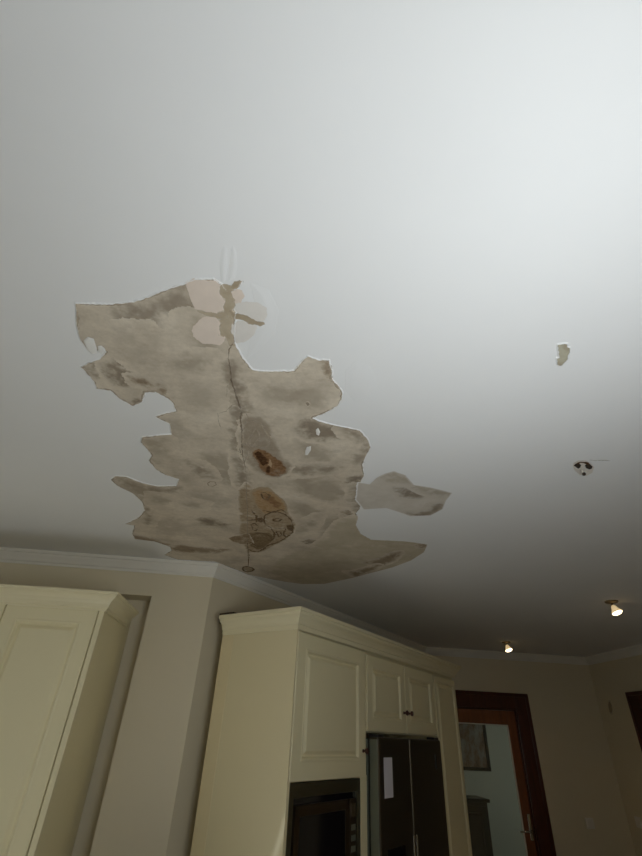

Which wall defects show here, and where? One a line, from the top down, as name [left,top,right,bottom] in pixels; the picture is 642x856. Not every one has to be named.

peeling [74,277,371,584]
crack [198,280,264,534]
rust [227,413,297,572]
leakage [82,285,453,584]
peeling [555,342,571,366]